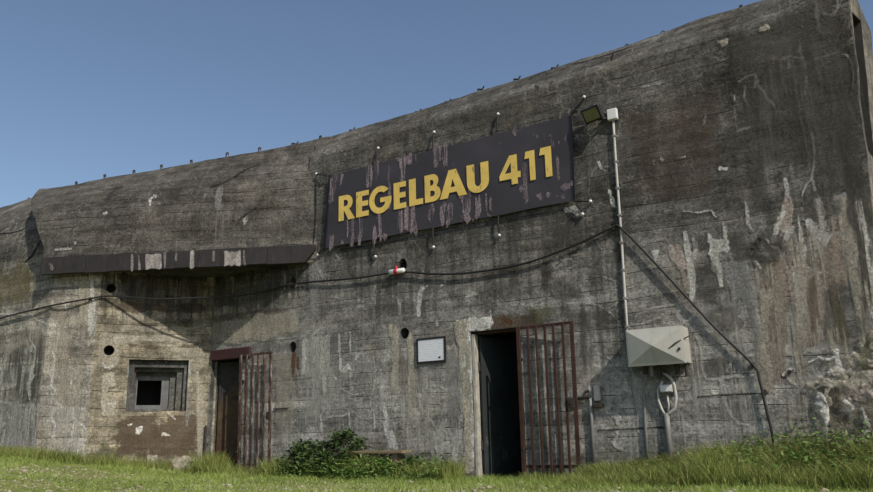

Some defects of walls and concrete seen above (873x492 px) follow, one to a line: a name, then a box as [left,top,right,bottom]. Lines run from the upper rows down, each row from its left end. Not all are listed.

water stain [652,0,873,448]
water stain [0,255,360,462]
spalling [781,349,873,444]